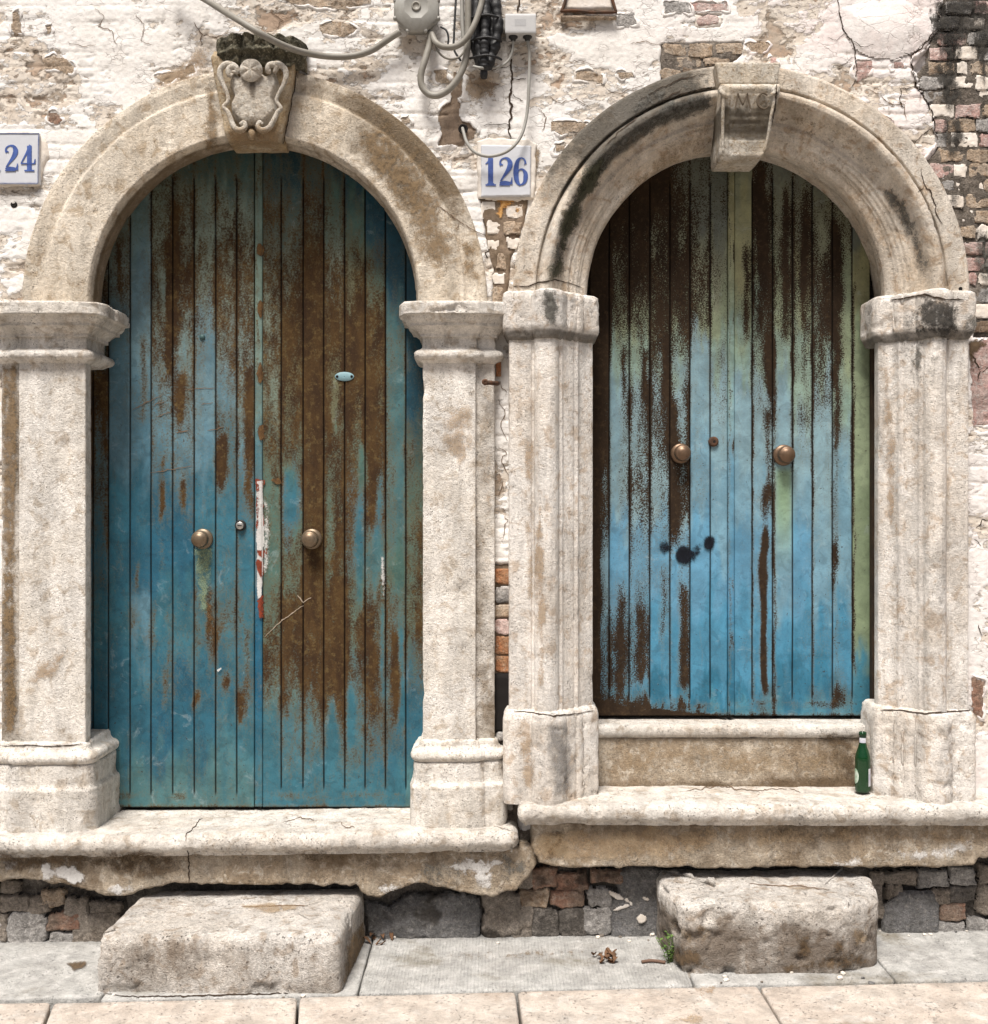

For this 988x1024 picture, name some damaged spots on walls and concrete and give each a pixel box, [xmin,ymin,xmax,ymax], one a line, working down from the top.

peeling [7,5,25,36]
peeling [42,51,79,78]
spalling [660,38,781,79]
crack [828,0,940,142]
peeling [45,106,66,125]
spalling [480,199,528,302]
damp [542,76,711,324]
damp [885,189,926,271]
spalling [888,0,988,429]
damp [0,851,177,878]